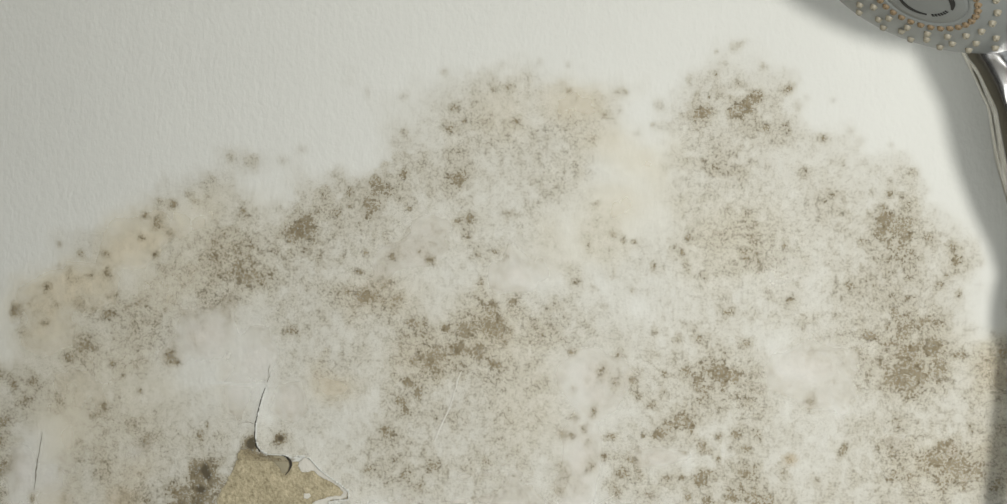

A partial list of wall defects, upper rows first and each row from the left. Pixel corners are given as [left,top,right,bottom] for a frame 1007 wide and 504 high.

damp [437,148,473,195]
damp [688,90,791,144]
damp [21,213,172,352]
damp [184,159,412,354]
damp [833,191,969,410]
damp [120,453,226,504]
damp [241,433,287,461]
crack [243,366,292,475]
peeling [216,449,348,504]
damp [306,262,665,491]
damp [560,327,781,504]
damp [875,414,1005,504]